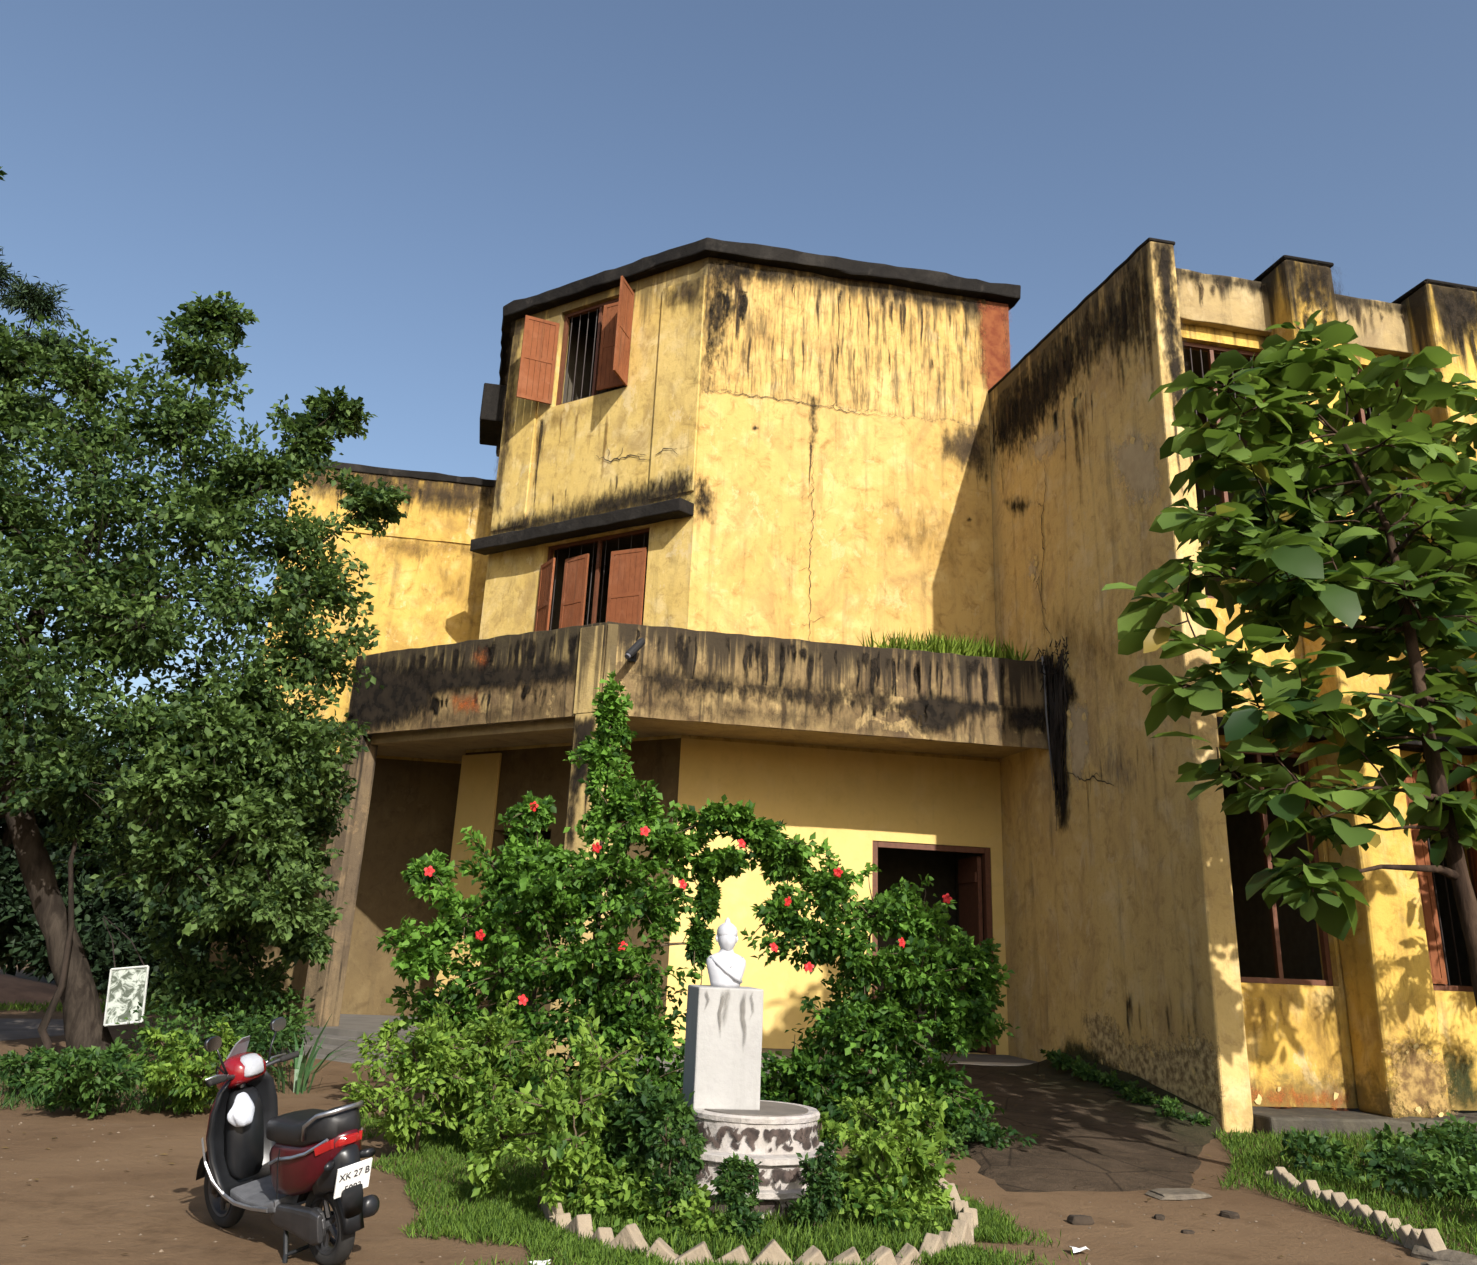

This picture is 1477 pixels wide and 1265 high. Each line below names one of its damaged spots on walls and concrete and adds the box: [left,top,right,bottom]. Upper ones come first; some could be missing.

water stain [305,321,712,535]
crack [598,448,677,463]
crack [799,453,821,641]
water stain [666,261,981,380]
water stain [943,244,1265,481]
water stain [1287,259,1405,350]
water stain [1425,281,1477,361]
water stain [638,636,1077,829]